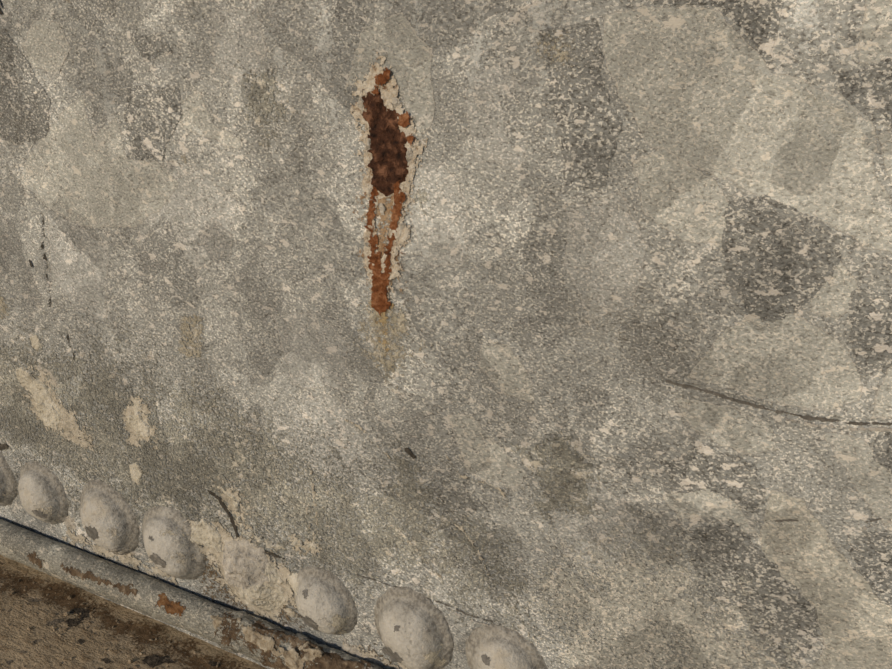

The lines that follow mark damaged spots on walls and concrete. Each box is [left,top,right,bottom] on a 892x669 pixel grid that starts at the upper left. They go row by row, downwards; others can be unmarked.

rust [350,52,428,390]
crack [40,219,51,307]
peeling [15,365,95,454]
peeling [120,396,159,450]
rust [27,551,45,570]
rust [60,563,138,597]
rust [155,593,186,616]
peeling [190,518,286,610]
rust [214,611,373,669]